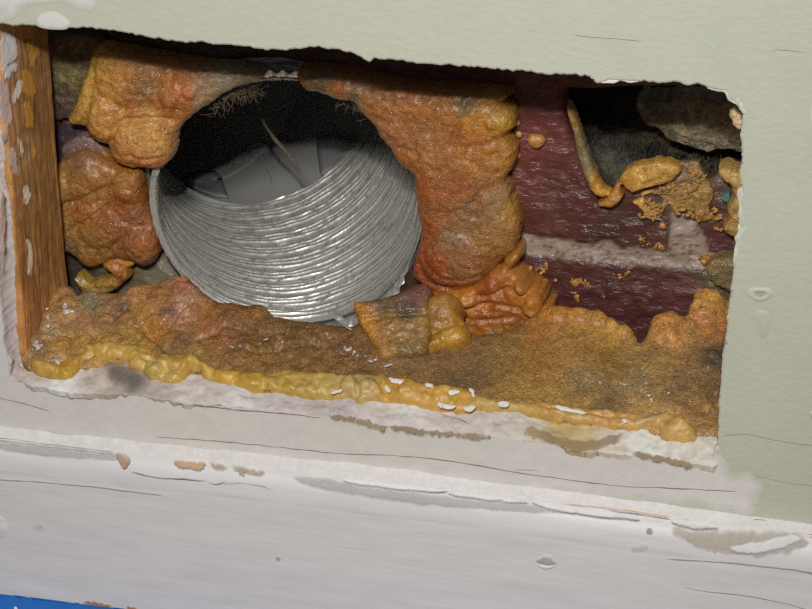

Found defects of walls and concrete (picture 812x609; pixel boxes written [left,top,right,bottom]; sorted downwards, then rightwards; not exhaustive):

peeling [116,453,130,469]
peeling [174,460,225,471]
peeling [235,466,263,476]
crack [162,437,737,492]
peeling [342,478,639,520]
peeling [671,520,807,555]